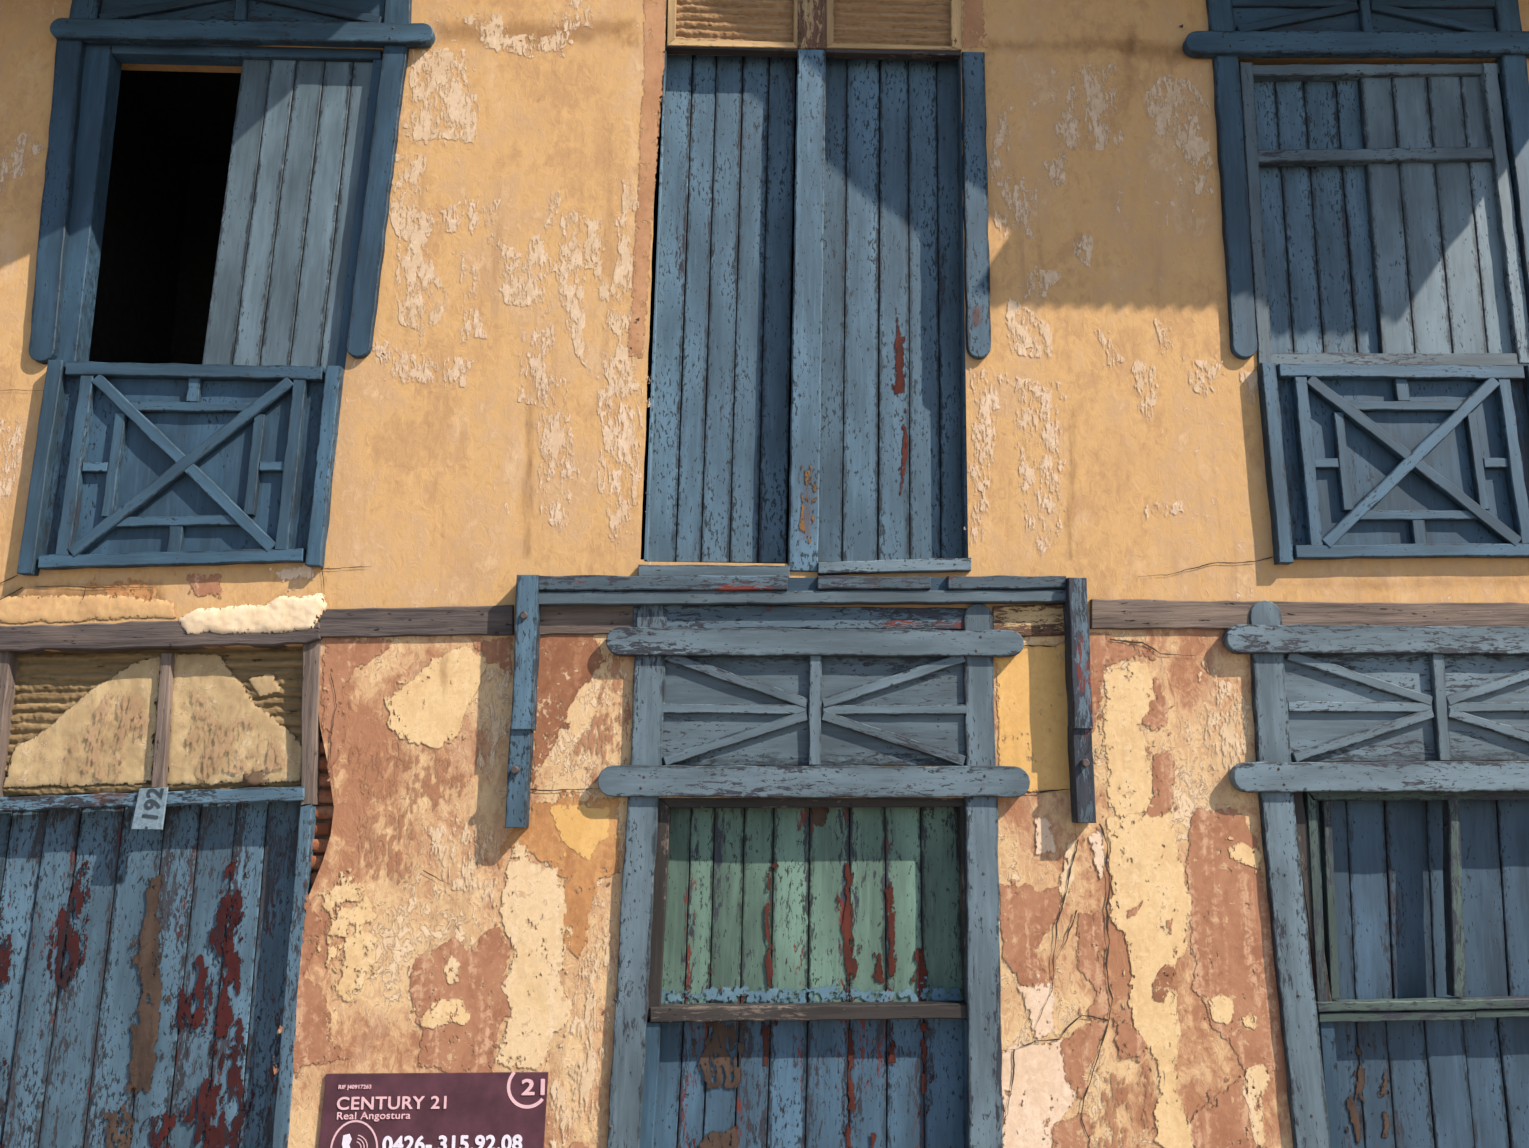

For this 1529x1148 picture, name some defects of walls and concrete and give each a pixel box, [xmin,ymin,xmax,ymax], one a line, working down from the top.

peeling [988,62,1125,240]
peeling [1143,75,1213,198]
flaking render [373,0,666,553]
peeling [1006,266,1062,359]
peeling [1094,318,1258,422]
peeling [964,368,1067,555]
crack [1138,557,1272,577]
crack [1026,787,1069,795]
peeling [0,907,14,1005]
peeling [3,634,632,1148]
crack [1002,824,1113,1144]
flaking render [994,632,1286,1148]